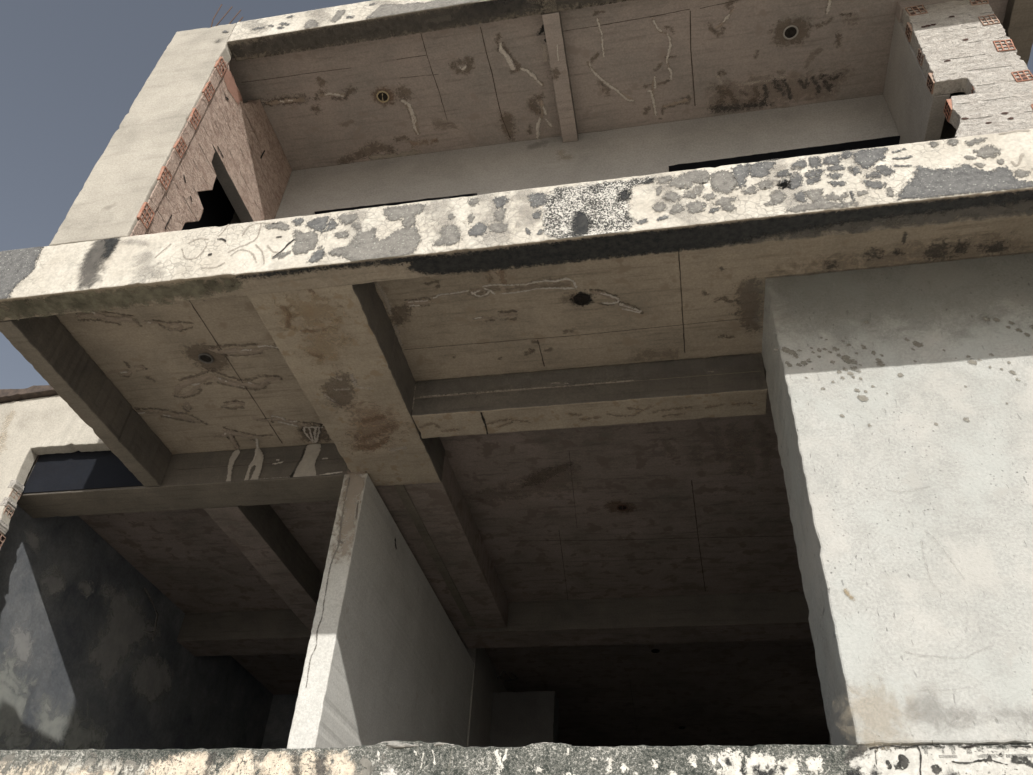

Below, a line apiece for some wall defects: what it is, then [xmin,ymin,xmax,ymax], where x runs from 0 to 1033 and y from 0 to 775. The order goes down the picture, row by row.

water stain [339,87,420,164]
water stain [216,0,635,140]
water stain [709,71,841,113]
crack [155,176,295,268]
peeling [264,195,509,263]
water stain [0,177,1033,332]
peeling [525,191,548,235]
peeling [634,130,1033,224]
water stain [135,371,365,559]
peeling [590,757,639,775]
peeling [685,747,827,775]
peeling [845,744,1033,775]